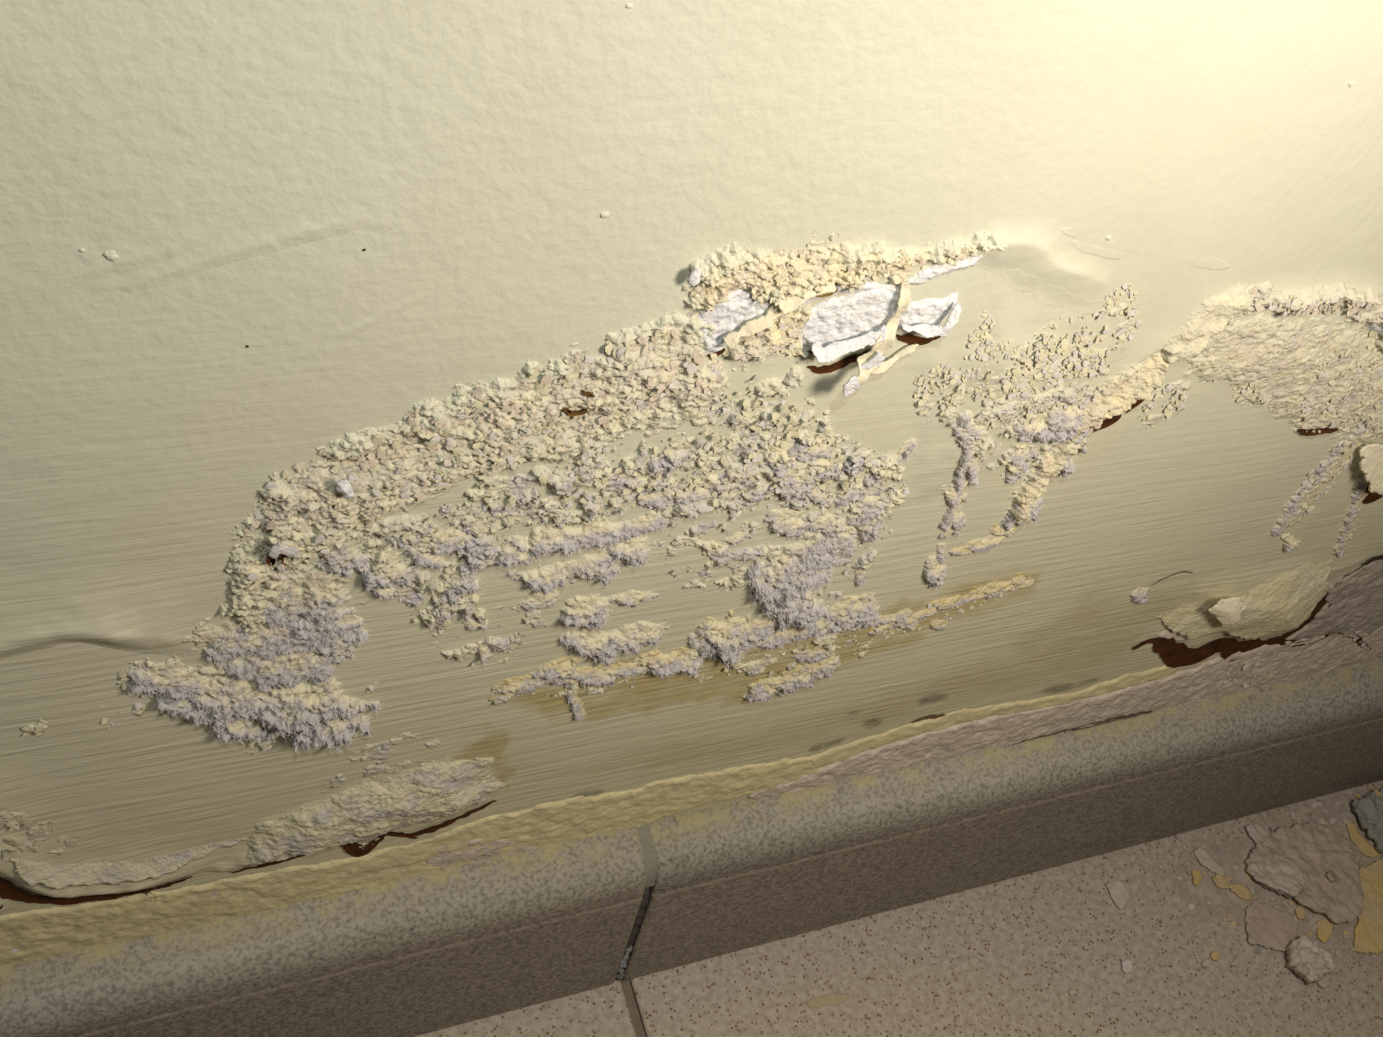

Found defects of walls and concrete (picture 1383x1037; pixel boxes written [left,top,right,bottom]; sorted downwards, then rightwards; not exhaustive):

water stain [119,403,1094,755]
flaking render [219,229,1009,633]
flaking render [747,555,1383,799]
flaking render [912,281,1383,522]
water stain [1270,427,1370,557]